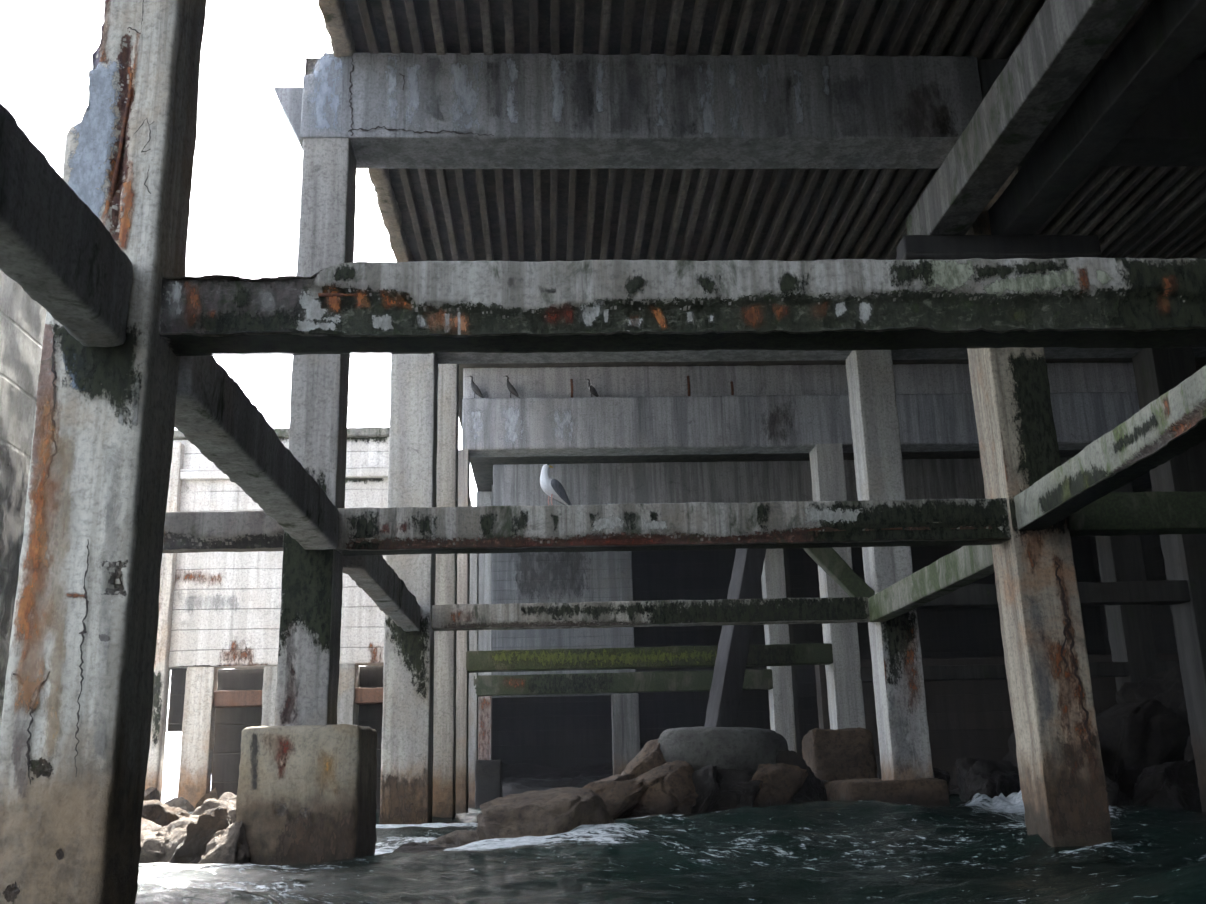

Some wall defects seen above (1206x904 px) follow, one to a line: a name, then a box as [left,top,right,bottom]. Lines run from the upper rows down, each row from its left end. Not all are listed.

peeling [67,0,136,241]
crack [348,54,494,136]
corrosion [323,285,340,313]
corrosion [652,308,666,330]
water stain [835,301,872,324]
corrosion [1078,268,1089,294]
water stain [0,445,28,693]
corrosion [14,395,60,711]
crack [13,539,89,785]
corrosion [264,737,293,778]
corrosion [1042,556,1098,790]
crack [1055,561,1097,778]